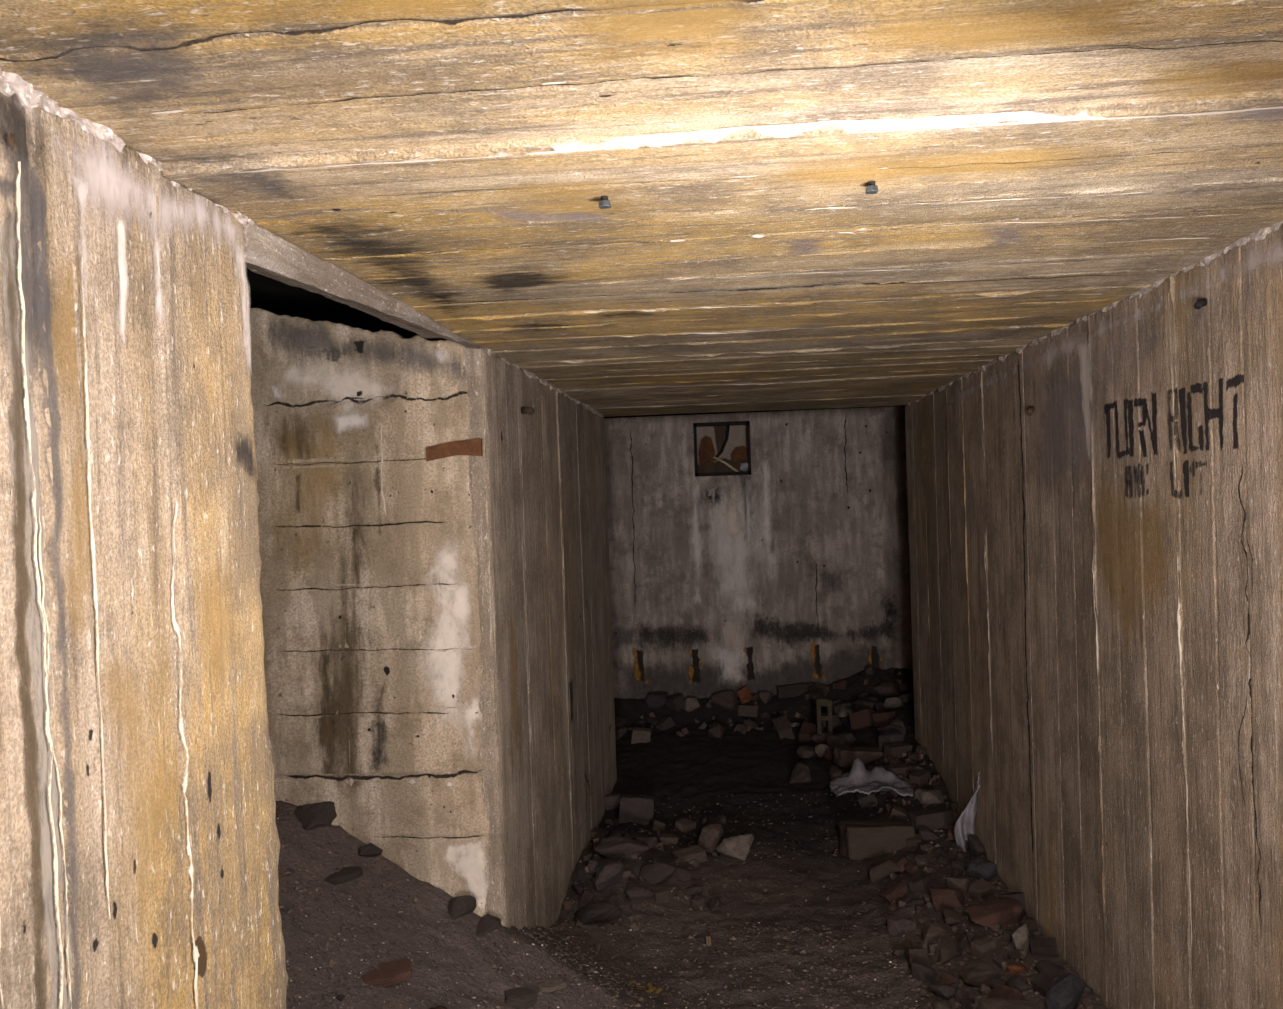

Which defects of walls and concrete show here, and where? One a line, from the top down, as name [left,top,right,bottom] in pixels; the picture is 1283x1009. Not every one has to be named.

damp [295,225,457,309]
damp [484,272,556,291]
crack [267,391,468,408]
damp [615,462,897,699]
damp [320,579,362,778]
corrosion [633,648,649,684]
corrosion [688,649,701,684]
corrosion [743,647,755,681]
corrosion [811,642,825,681]
damp [373,718,386,769]
crack [285,769,483,786]